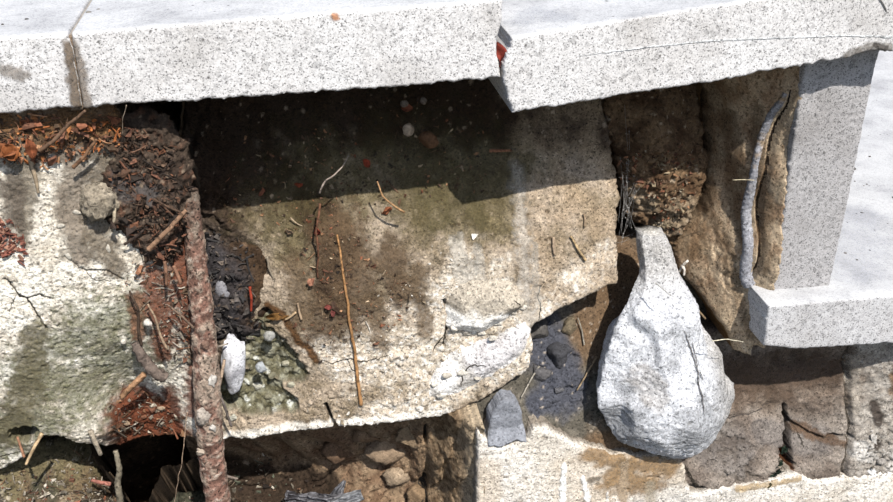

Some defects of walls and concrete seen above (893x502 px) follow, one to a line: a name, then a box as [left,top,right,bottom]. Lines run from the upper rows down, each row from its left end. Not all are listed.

crack [753,90,792,270]
spalling [59,249,76,260]
damp [286,205,432,349]
damp [449,232,479,284]
spalling [220,309,307,421]
spalling [112,407,147,436]
crack [727,346,851,473]
spalling [870,400,884,427]
spalling [867,439,886,476]